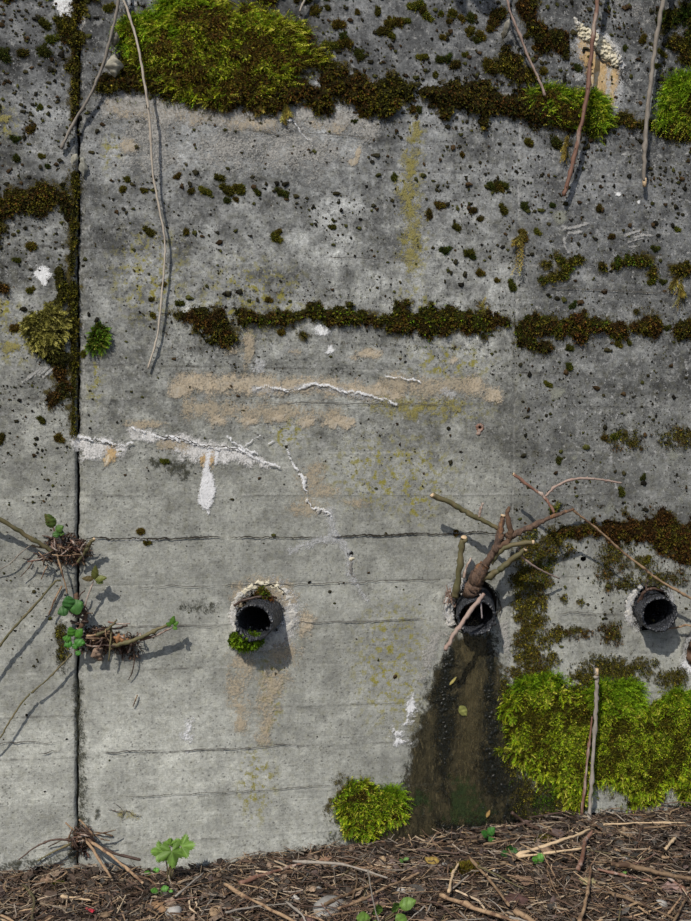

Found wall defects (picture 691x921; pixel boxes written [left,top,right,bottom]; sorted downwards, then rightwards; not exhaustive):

leakage [167,332,504,430]
leakage [326,620,569,848]